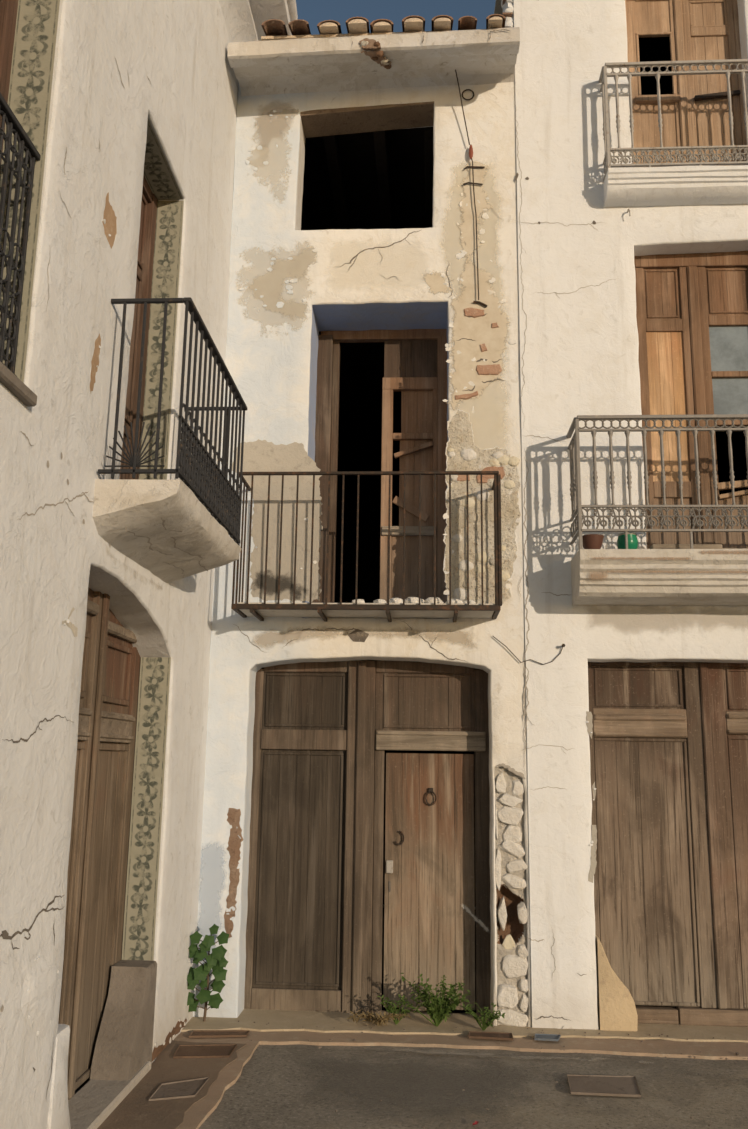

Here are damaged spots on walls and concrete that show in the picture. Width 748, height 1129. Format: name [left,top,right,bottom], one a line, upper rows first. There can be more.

peeling [101,190,117,249]
peeling [238,248,318,320]
crack [340,231,419,279]
peeling [423,161,516,410]
peeling [89,333,101,396]
crack [491,73,612,790]
crack [17,491,94,520]
crack [2,715,68,743]
crack [0,895,64,950]
spalling [493,766,530,1027]